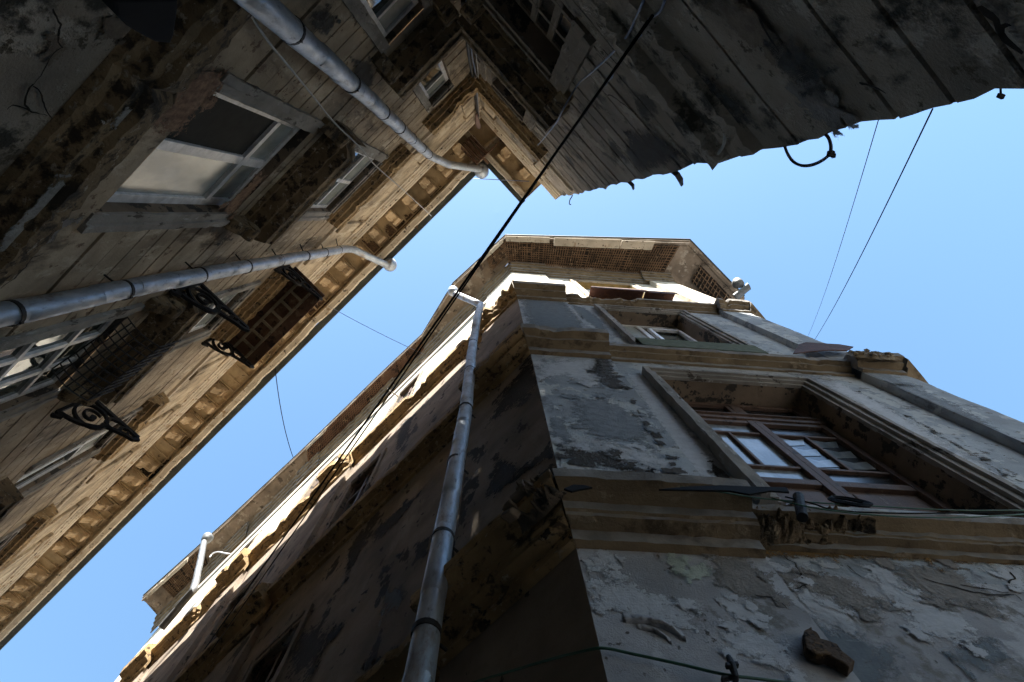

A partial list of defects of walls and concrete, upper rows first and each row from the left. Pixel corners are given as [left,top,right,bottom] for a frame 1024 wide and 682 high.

crack [7,8,64,122]
damp [0,174,72,252]
peeling [510,356,730,483]
peeling [582,549,1024,682]